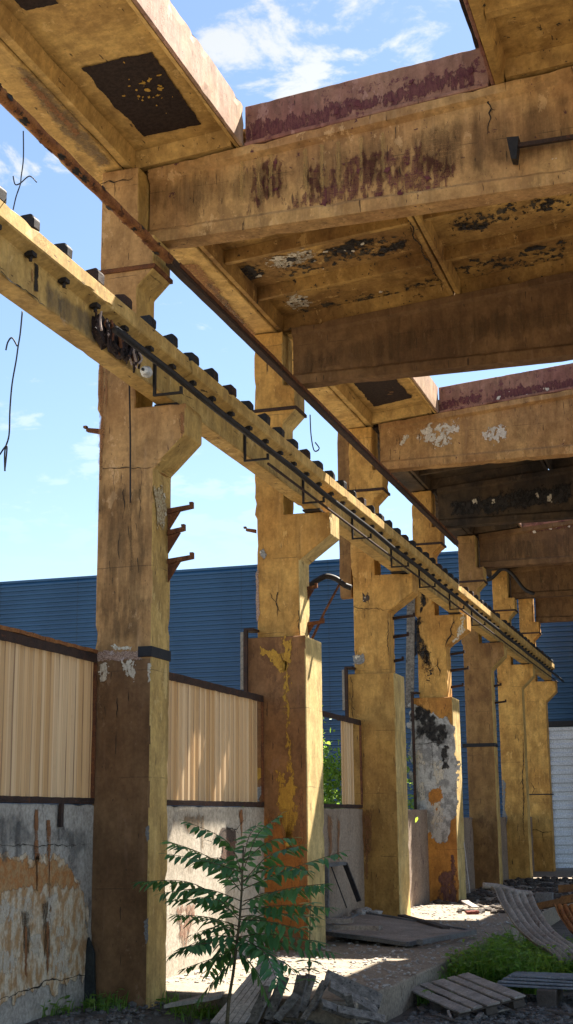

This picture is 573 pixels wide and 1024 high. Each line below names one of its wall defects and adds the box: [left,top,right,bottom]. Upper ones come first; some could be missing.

peeling [122,74,173,106]
peeling [448,194,571,236]
peeling [240,236,407,281]
peeling [455,240,569,277]
peeling [286,278,441,313]
peeling [399,378,573,449]
spalling [450,482,572,516]
spalling [97,644,151,682]
peeling [260,635,299,848]
peeling [406,703,461,844]
rust [34,809,51,972]
peeling [0,851,89,1005]